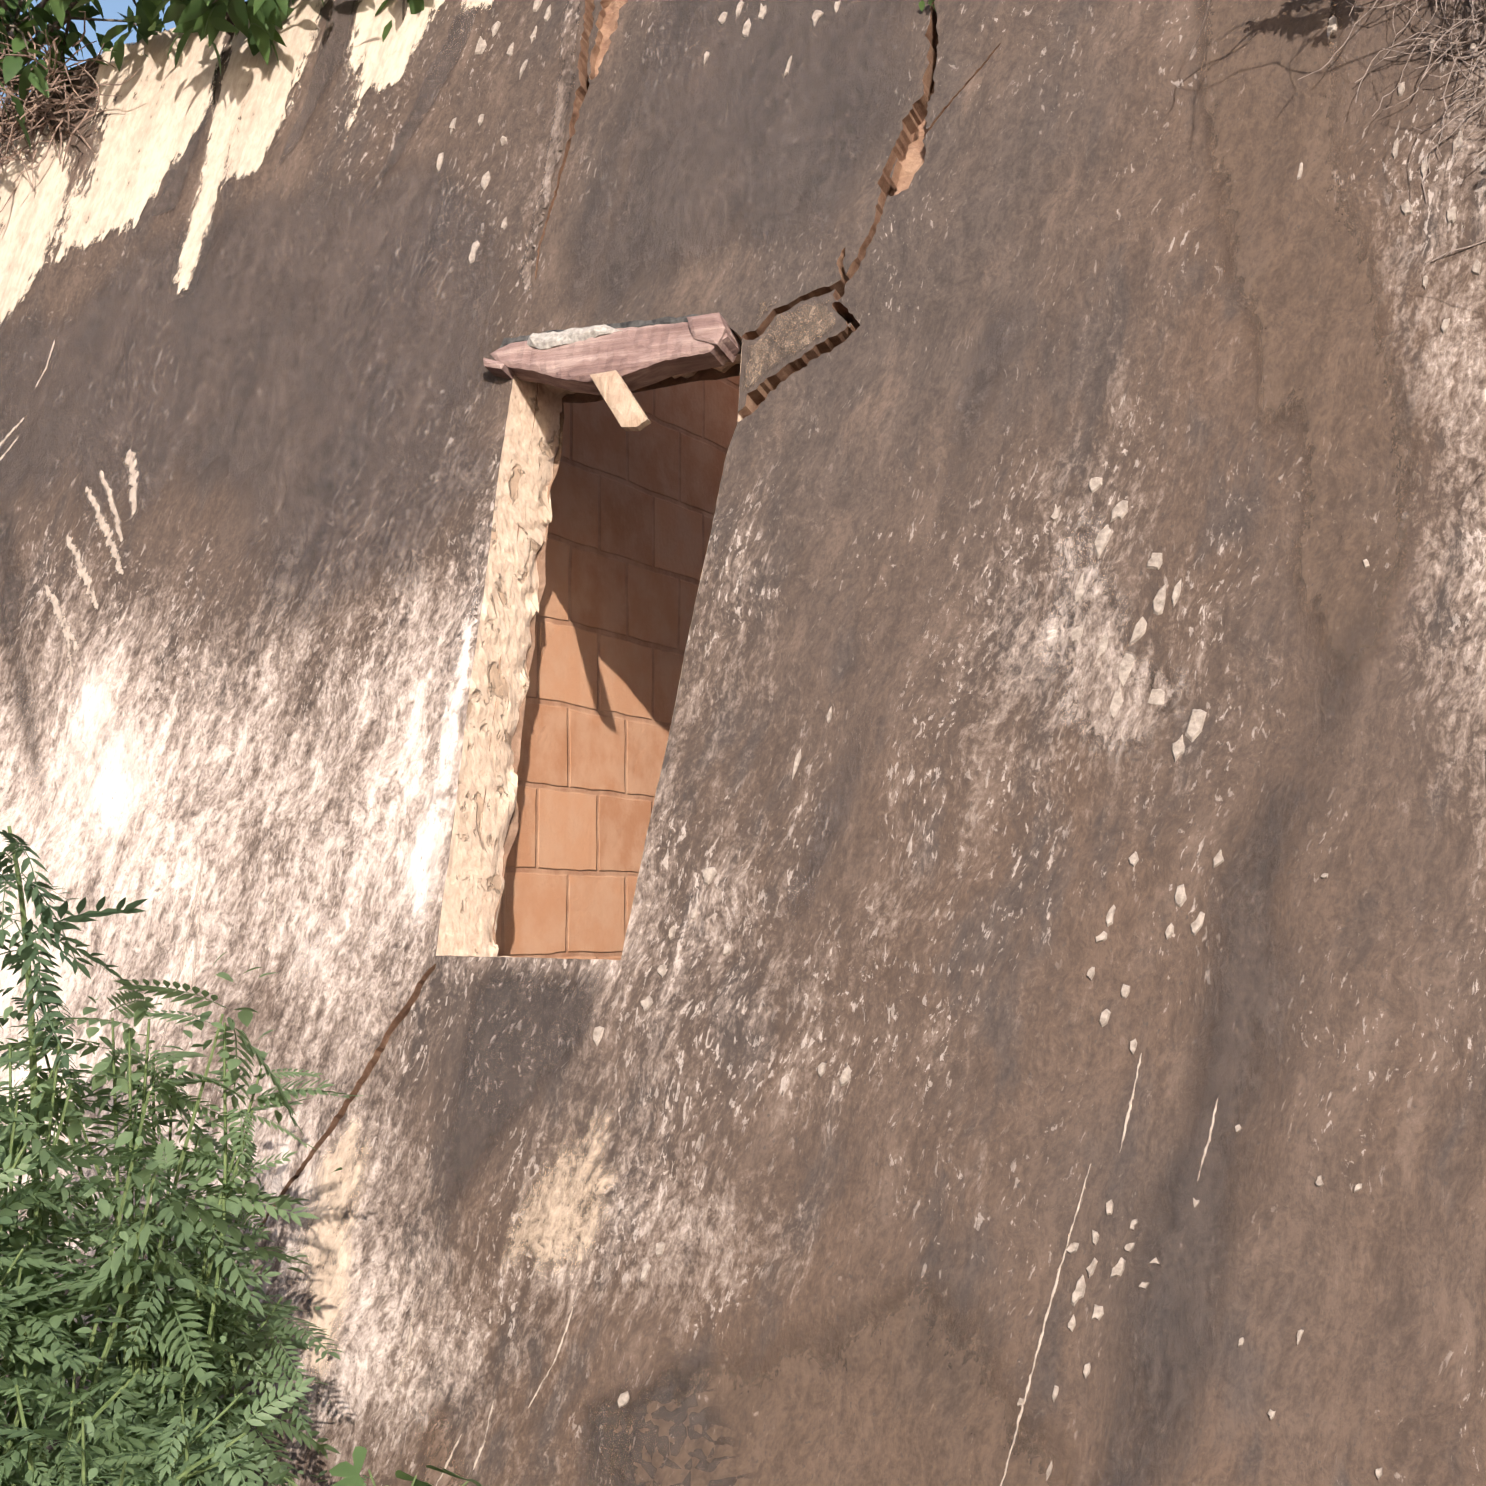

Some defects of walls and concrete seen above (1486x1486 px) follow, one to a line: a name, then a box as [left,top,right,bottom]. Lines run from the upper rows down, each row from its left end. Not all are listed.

peeling [0,0,328,323]
peeling [345,0,580,290]
crack [535,0,628,280]
crack [738,1,1001,419]
peeling [1327,16,1338,39]
peeling [1400,200,1413,216]
peeling [1447,206,1457,224]
peeling [1452,129,1463,155]
peeling [1471,259,1481,275]
peeling [407,598,480,919]
crack [257,964,436,1230]
peeling [618,1390,630,1408]